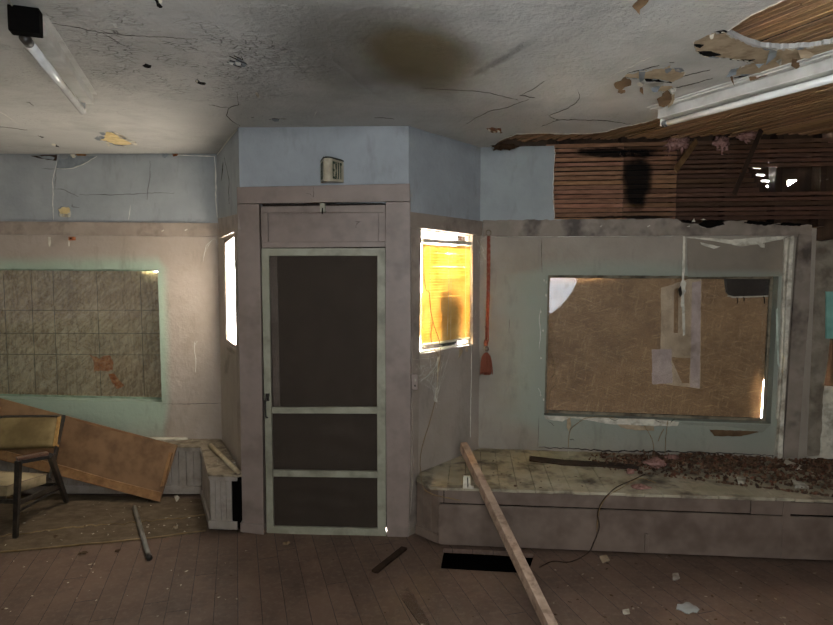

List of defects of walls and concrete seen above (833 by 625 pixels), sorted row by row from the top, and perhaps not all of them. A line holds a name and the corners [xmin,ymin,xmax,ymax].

peeling [632,0,649,15]
spalling [693,30,833,85]
crack [425,83,542,123]
crack [543,92,625,126]
peeling [614,62,713,108]
spalling [95,132,137,147]
water stain [578,148,670,219]